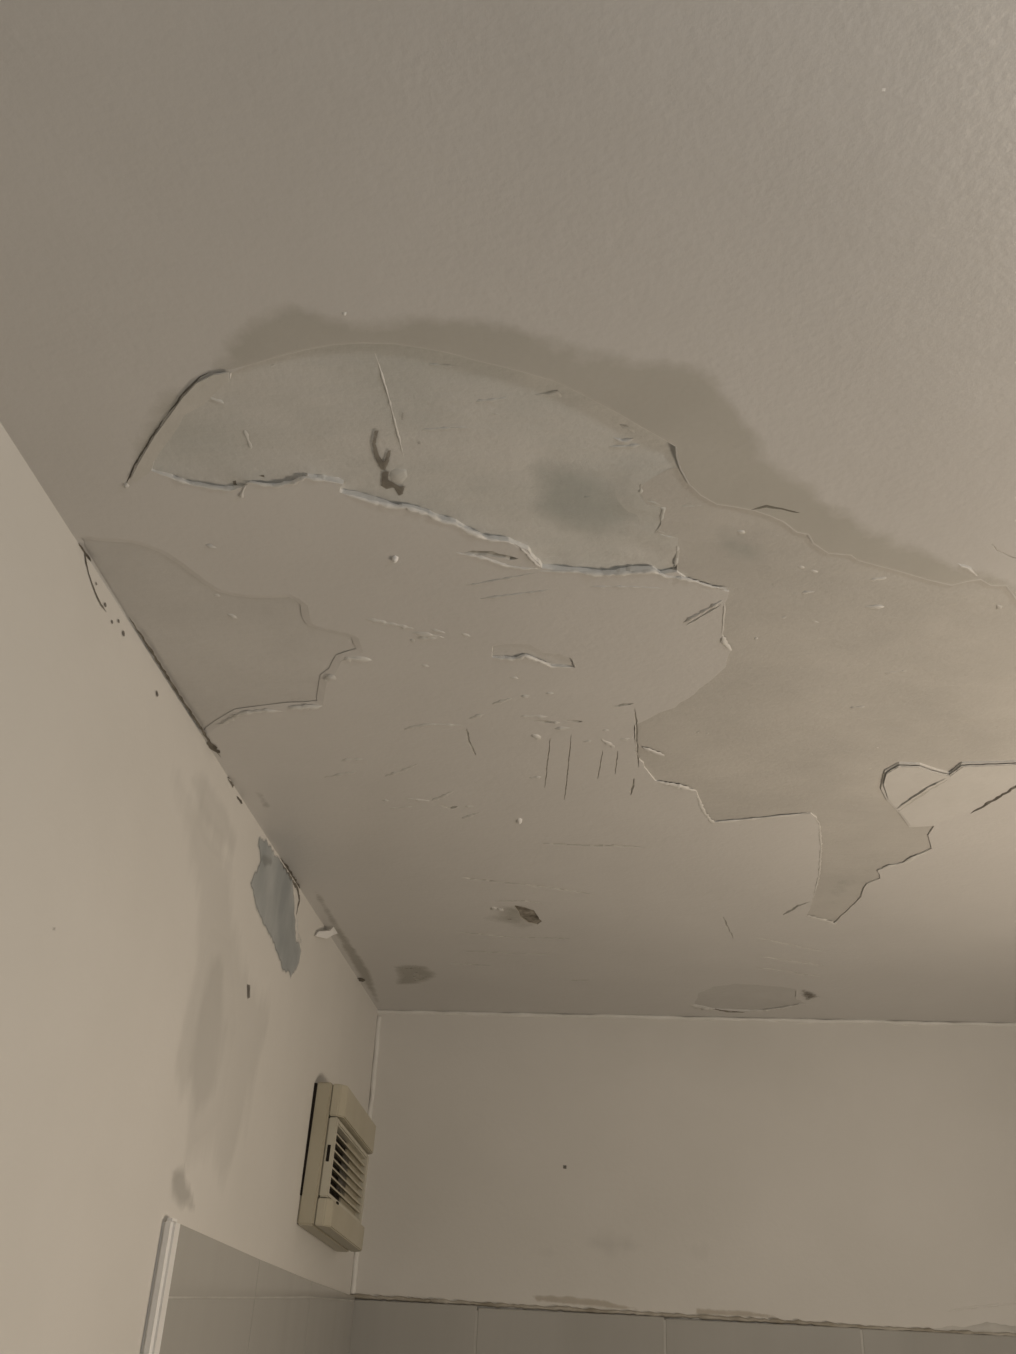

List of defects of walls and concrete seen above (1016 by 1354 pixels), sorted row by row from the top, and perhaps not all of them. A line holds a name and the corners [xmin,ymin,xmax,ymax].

flaking render [131,343,725,589]
peeling [73,535,372,734]
peeling [251,838,337,976]
spalling [490,905,541,924]